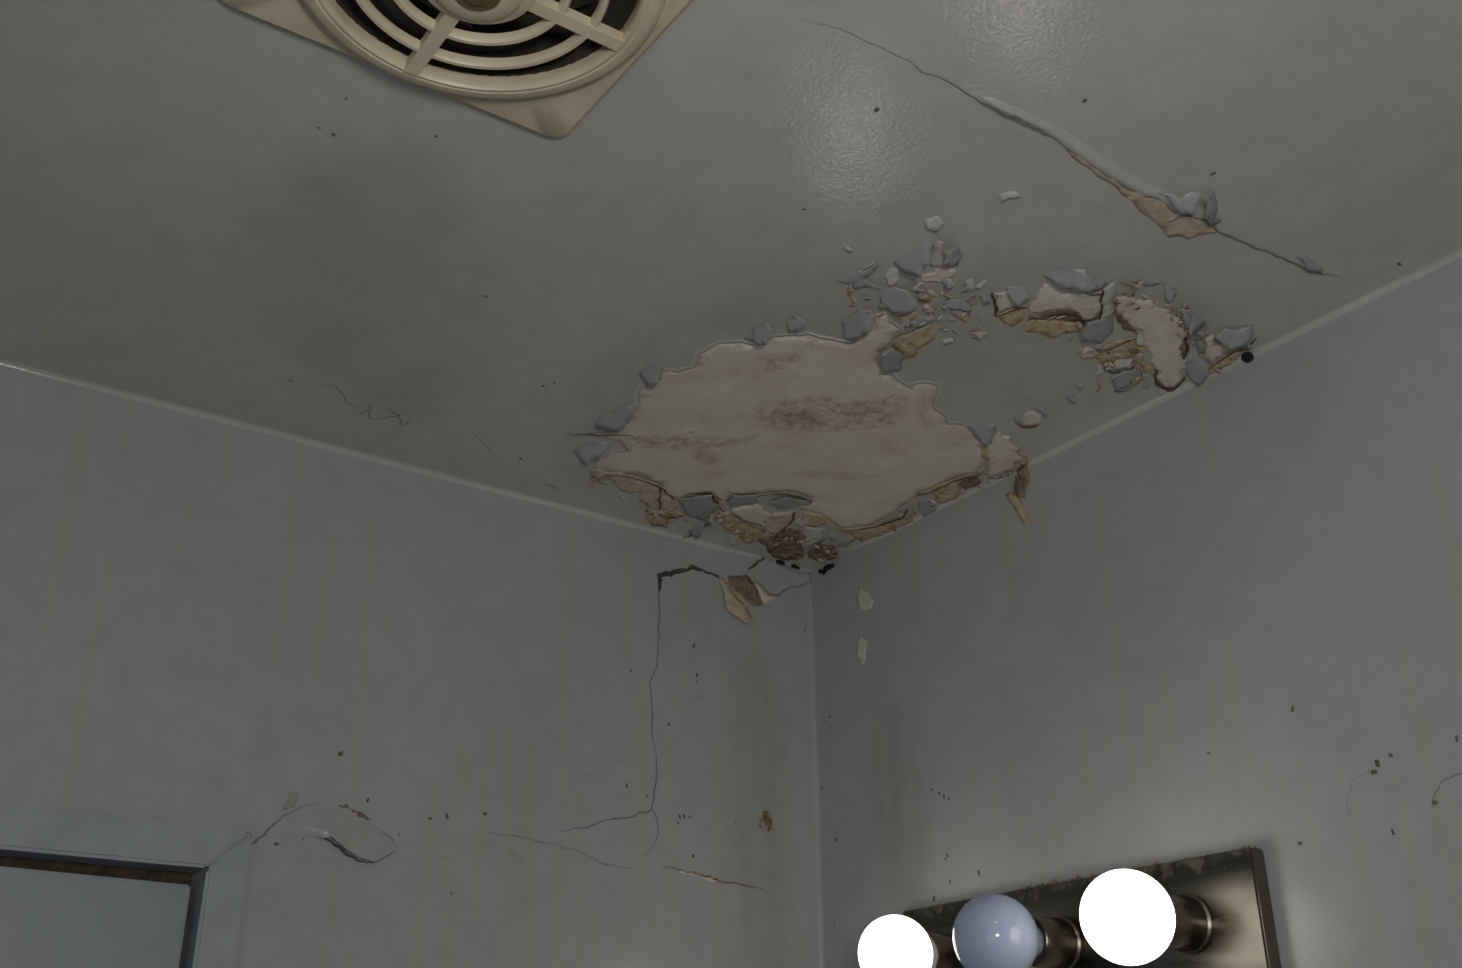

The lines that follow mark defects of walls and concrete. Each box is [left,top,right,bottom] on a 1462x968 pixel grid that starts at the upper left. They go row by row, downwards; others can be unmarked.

crack [805,20,1341,277]
peeling [567,308,1048,624]
peeling [991,266,1257,403]
crack [486,565,767,893]